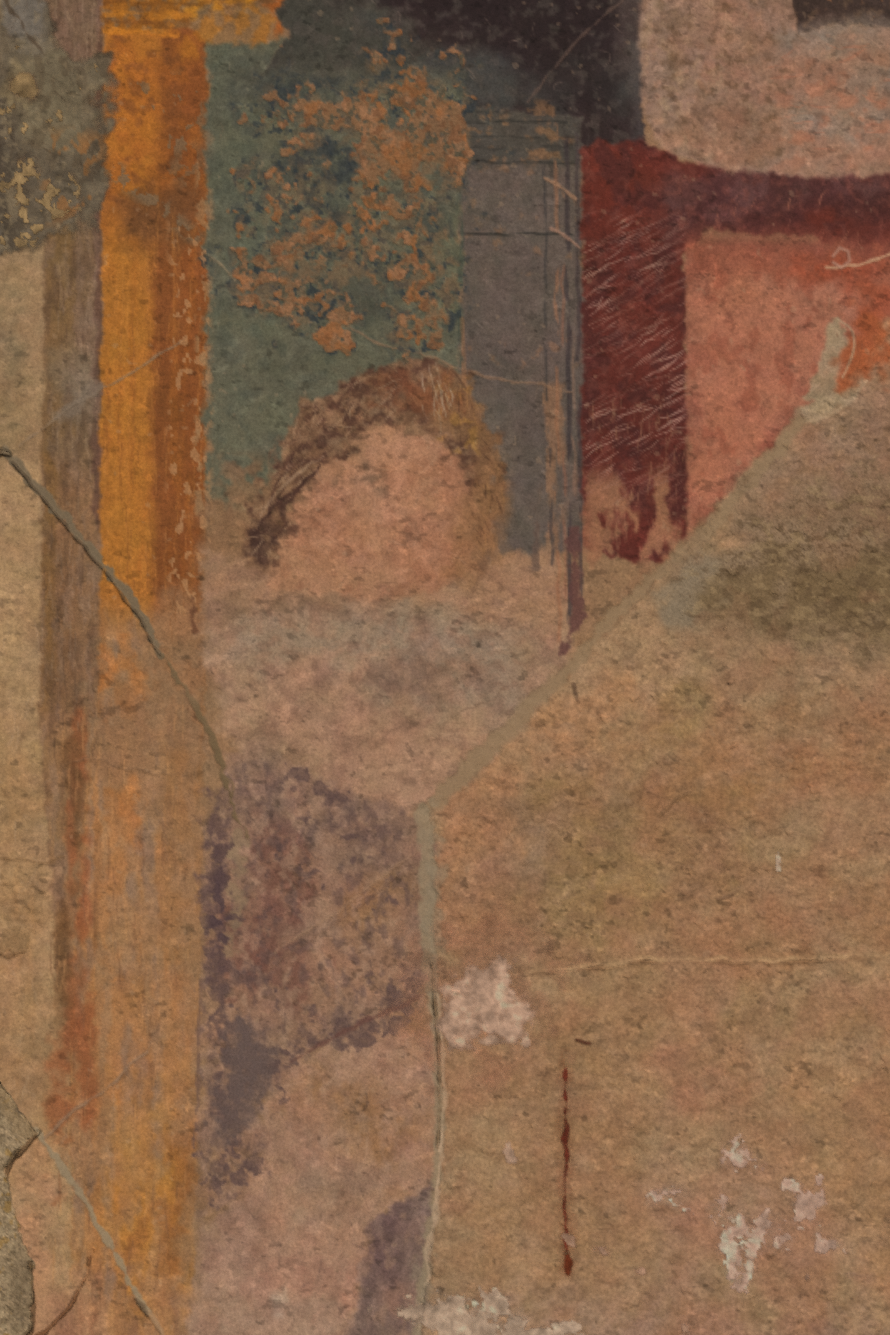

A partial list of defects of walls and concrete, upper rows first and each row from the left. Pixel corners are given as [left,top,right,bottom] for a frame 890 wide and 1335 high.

crack [825,248,890,271]
crack [0,446,252,960]
crack [412,411,806,1335]
efflorescence [436,956,534,1049]
crack [510,956,890,980]
crack [34,1042,166,1335]
efflorescence [721,1136,757,1172]
efflorescence [710,1174,845,1293]
efflorescence [398,1288,583,1335]